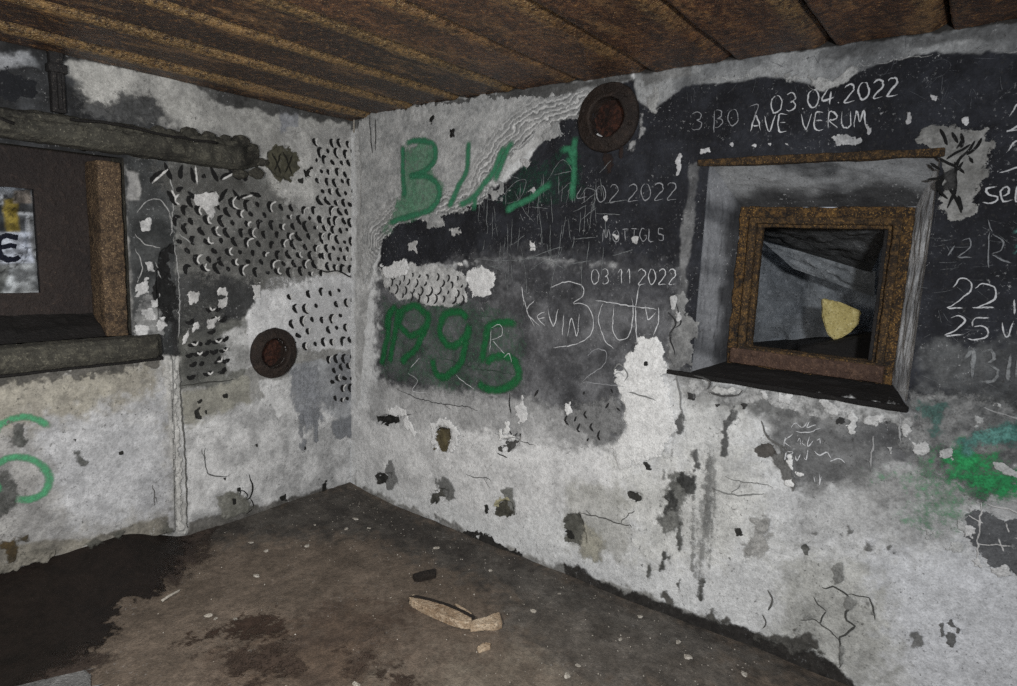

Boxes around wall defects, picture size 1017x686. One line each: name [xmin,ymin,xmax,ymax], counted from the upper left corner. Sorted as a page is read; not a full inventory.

spalling [377,406,417,438]
spalling [430,417,461,453]
spalling [563,291,1017,577]
spalling [484,488,515,517]
damp [0,526,217,686]
crack [802,563,875,668]